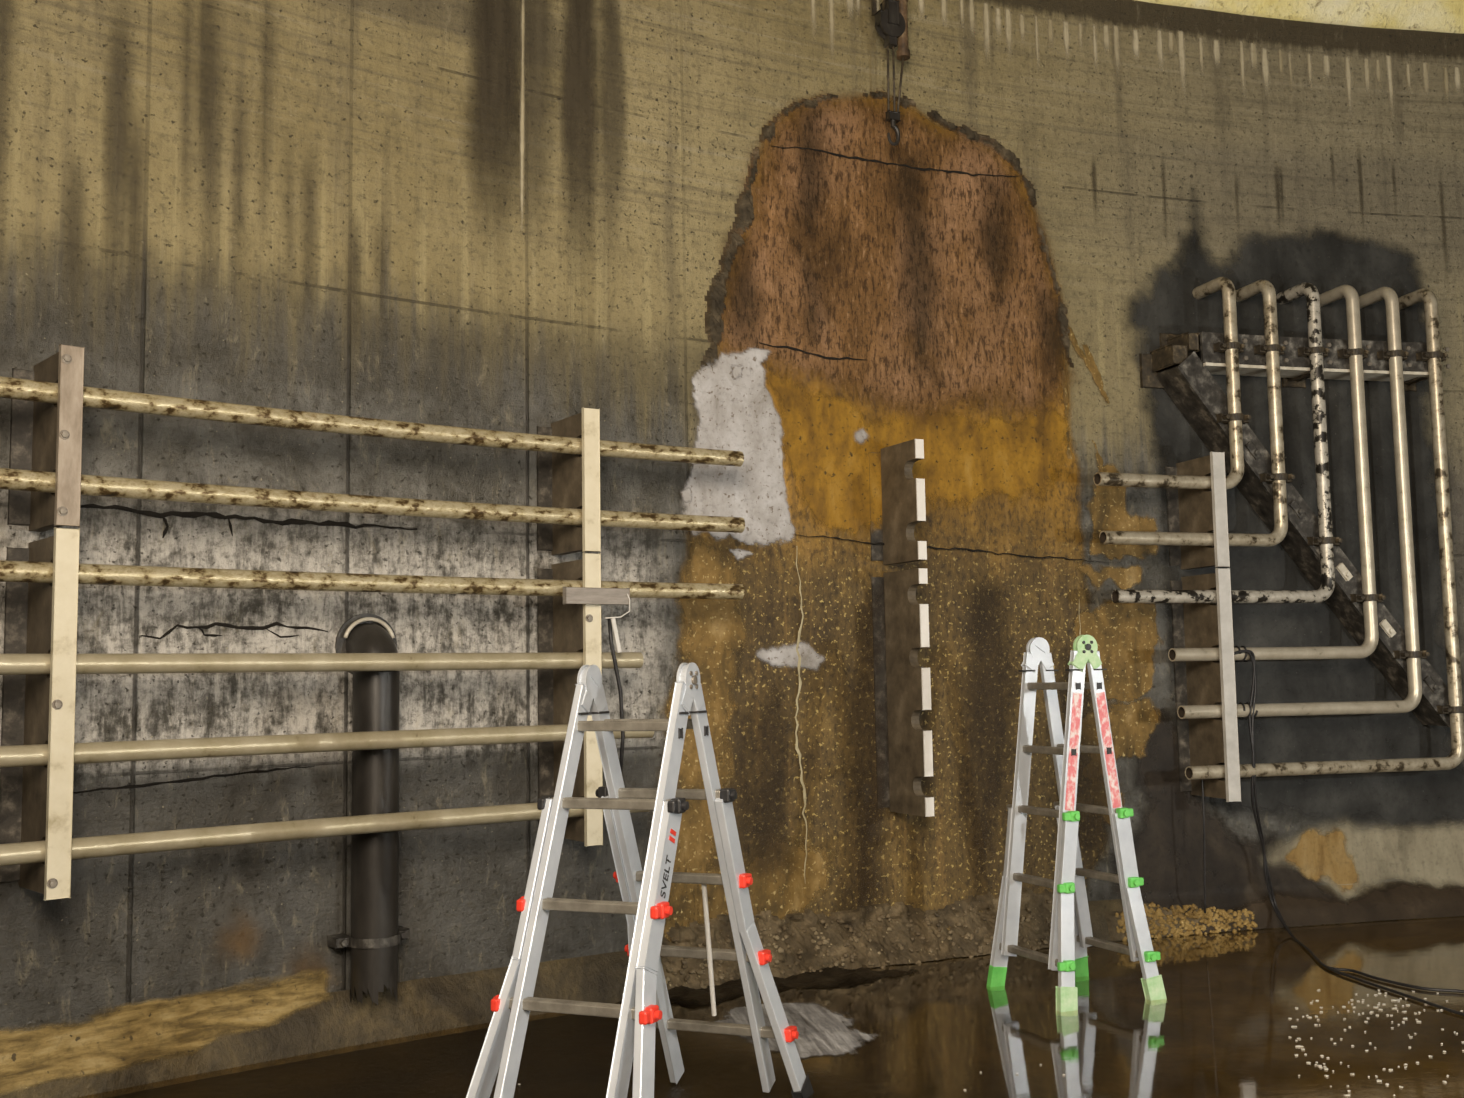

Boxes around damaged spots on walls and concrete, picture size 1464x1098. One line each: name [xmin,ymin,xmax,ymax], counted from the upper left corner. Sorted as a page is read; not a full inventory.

water stain [473,0,624,206]
crack [773,146,1016,177]
water stain [1240,41,1460,104]
peeling [681,93,838,559]
spalling [863,90,1110,459]
water stain [1130,227,1426,362]
crack [80,504,417,538]
corrosion [663,97,1160,940]
crack [141,622,328,639]
peeling [757,643,824,670]
crack [795,534,884,884]
water stain [1133,374,1464,933]